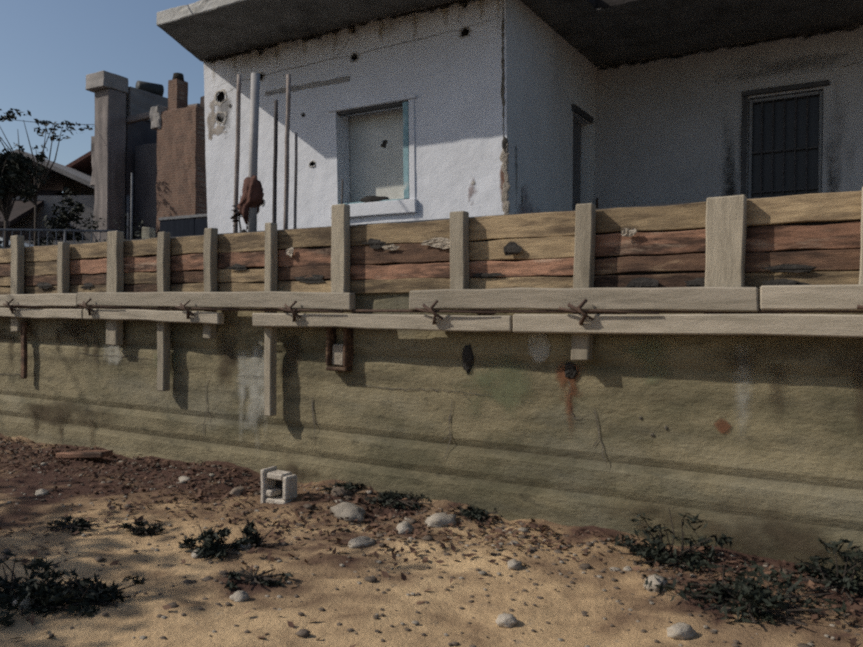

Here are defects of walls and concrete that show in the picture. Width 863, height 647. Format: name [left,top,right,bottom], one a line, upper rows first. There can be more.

spalling [207,89,232,140]
spalling [500,136,510,215]
leakage [726,156,735,196]